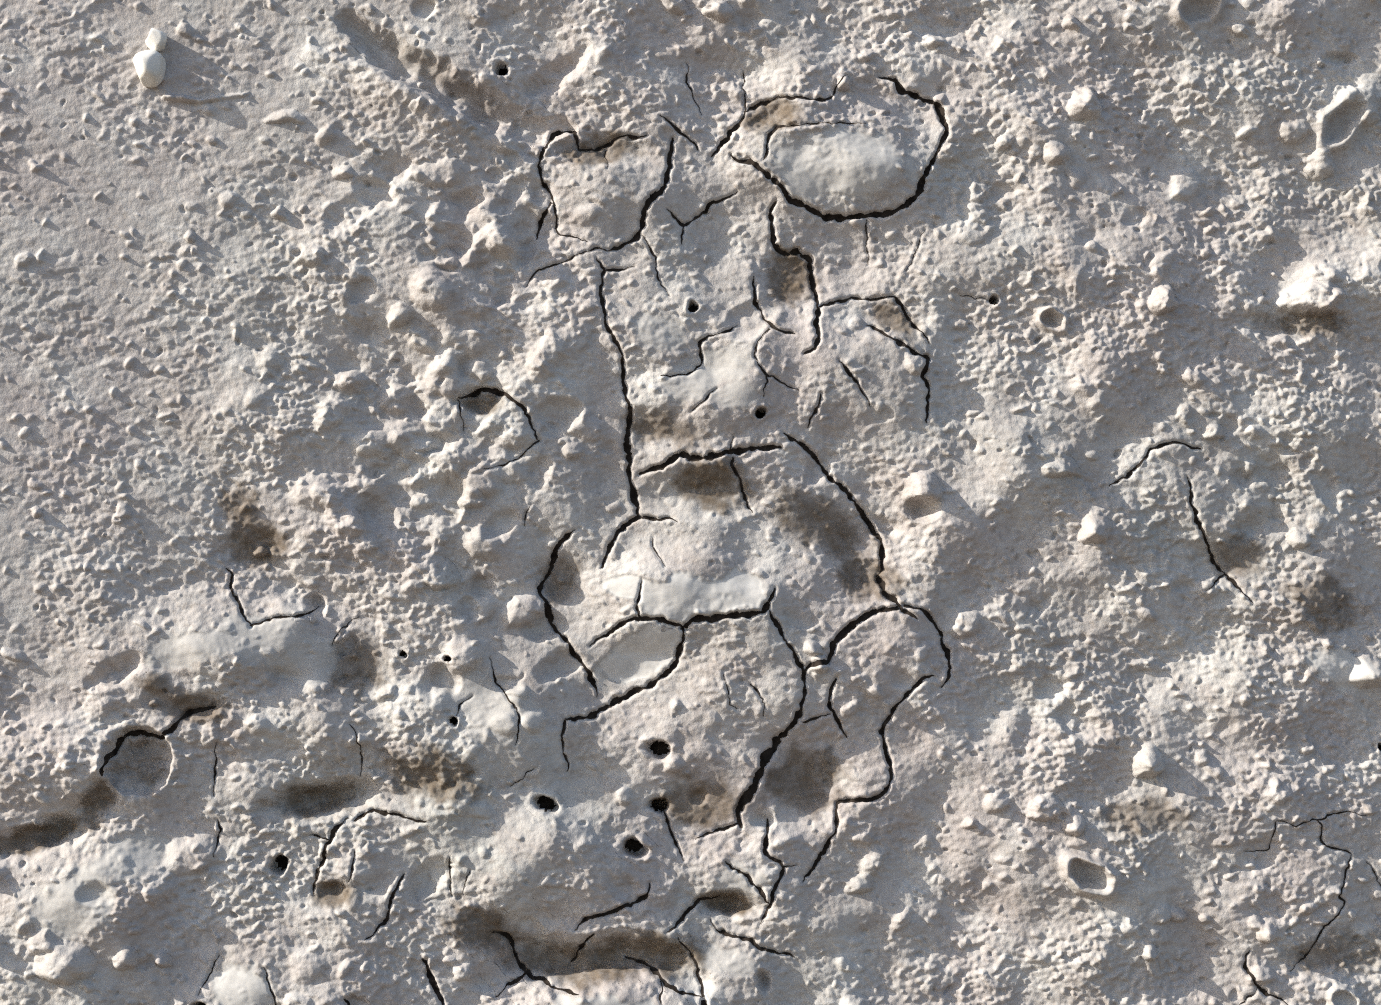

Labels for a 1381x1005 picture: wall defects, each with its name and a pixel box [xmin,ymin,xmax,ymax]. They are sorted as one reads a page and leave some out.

crack [458,388,540,469]
crack [526,67,951,1005]
crack [1109,441,1253,604]
crack [226,568,357,645]
crack [99,706,216,776]
crack [454,659,534,787]
crack [213,746,222,857]
crack [492,883,650,997]
crack [1239,811,1381,1005]